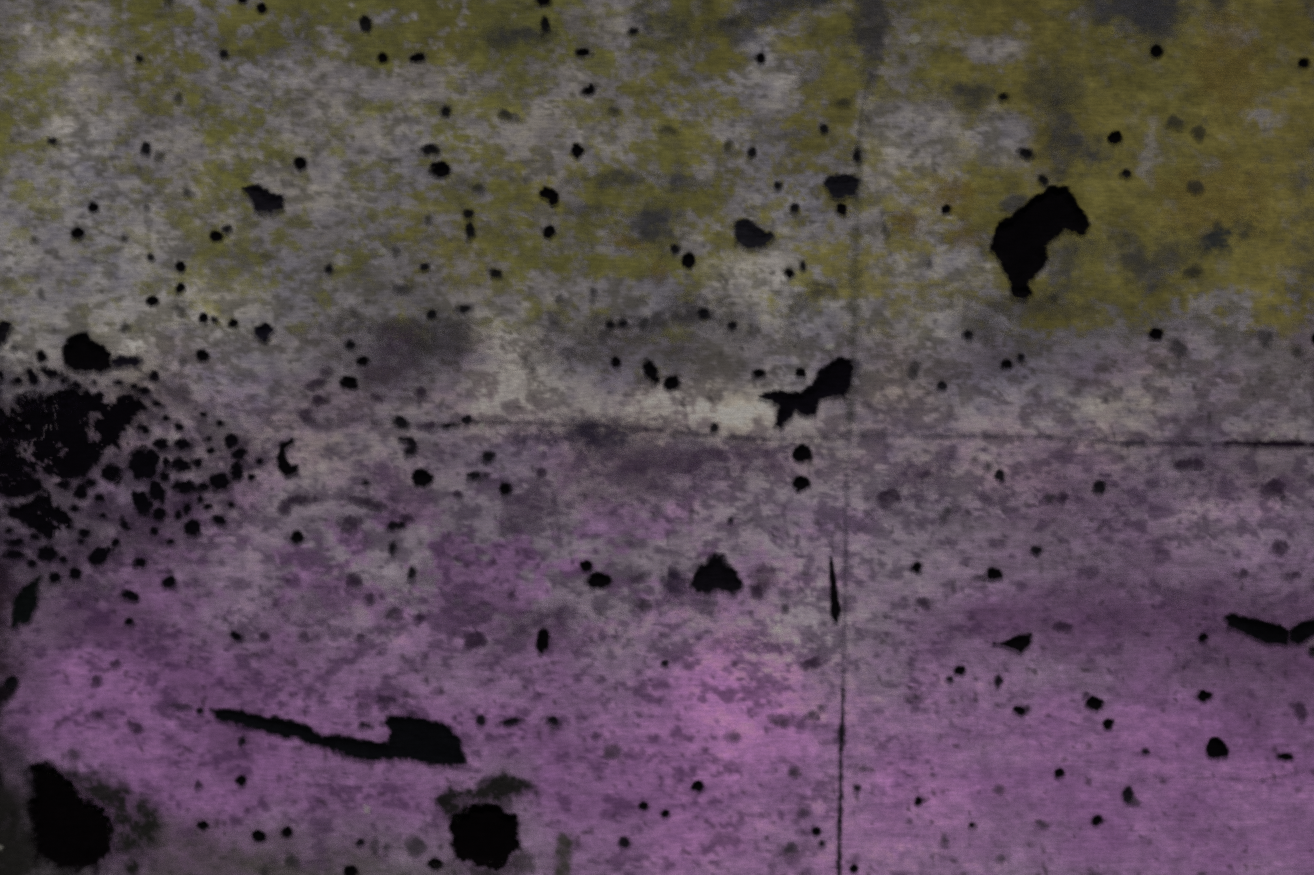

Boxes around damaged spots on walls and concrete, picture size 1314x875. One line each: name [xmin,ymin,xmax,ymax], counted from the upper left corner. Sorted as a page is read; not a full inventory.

water stain [0,0,1314,358]
hole [61,331,144,373]
crack [472,159,888,440]
hole [758,356,863,429]
water stain [908,358,920,377]
crack [922,431,998,439]
hole [989,184,1091,301]
crack [1037,434,1314,448]
water stain [0,364,1314,875]
hole [24,761,163,875]
hole [168,693,538,875]
crack [836,671,846,875]